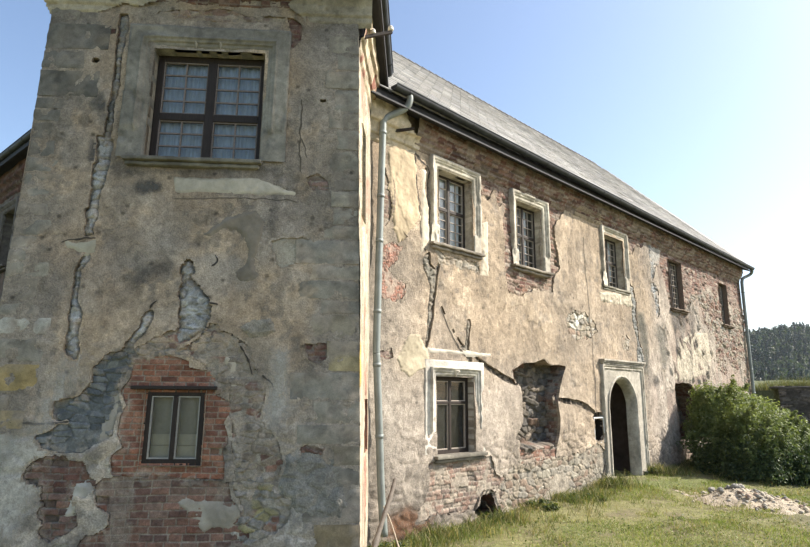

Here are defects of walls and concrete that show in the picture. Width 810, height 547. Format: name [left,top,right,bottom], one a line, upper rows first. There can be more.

spalling [177,259,218,343]
flaking render [381,143,429,302]
crack [414,151,517,385]
crack [630,286,645,365]
flaking render [23,341,249,547]
flaking render [417,456,512,522]